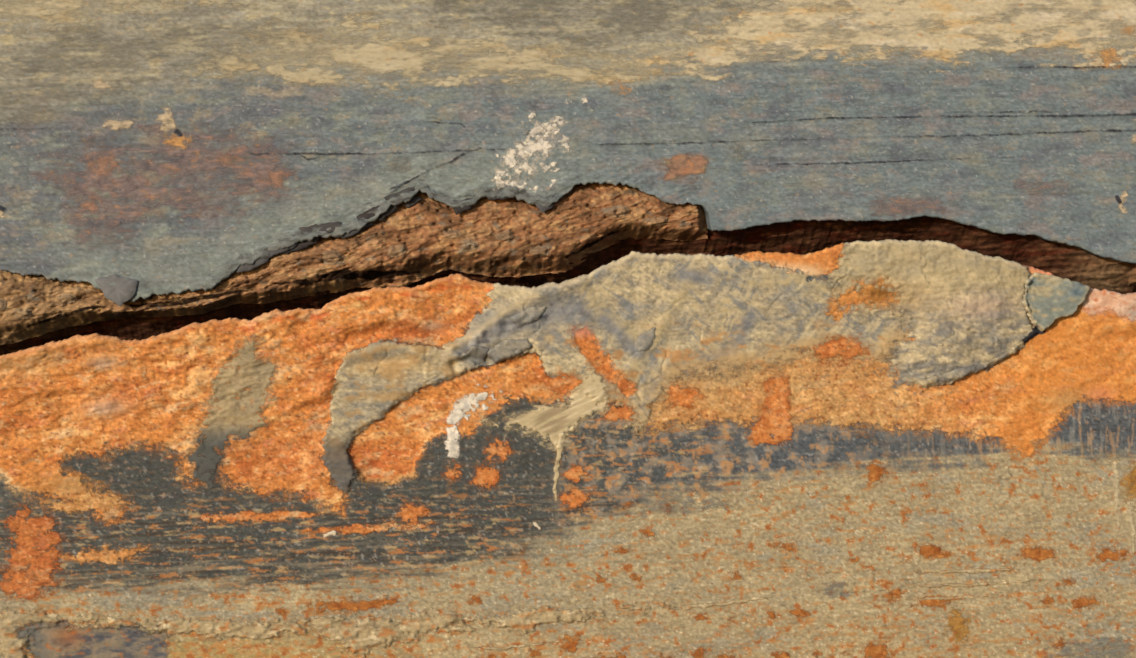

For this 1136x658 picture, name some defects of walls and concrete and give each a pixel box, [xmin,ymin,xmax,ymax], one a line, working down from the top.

corrosion [734,242,844,276]
crack [0,216,1136,356]
corrosion [825,278,899,321]
peeling [0,183,913,500]
corrosion [572,304,1136,459]
corrosion [0,273,495,600]
corrosion [347,353,582,488]
corrosion [560,464,590,509]
corrosion [1016,546,1055,562]
spalling [16,620,170,658]
corrosion [306,595,398,613]
corrosion [884,588,971,641]